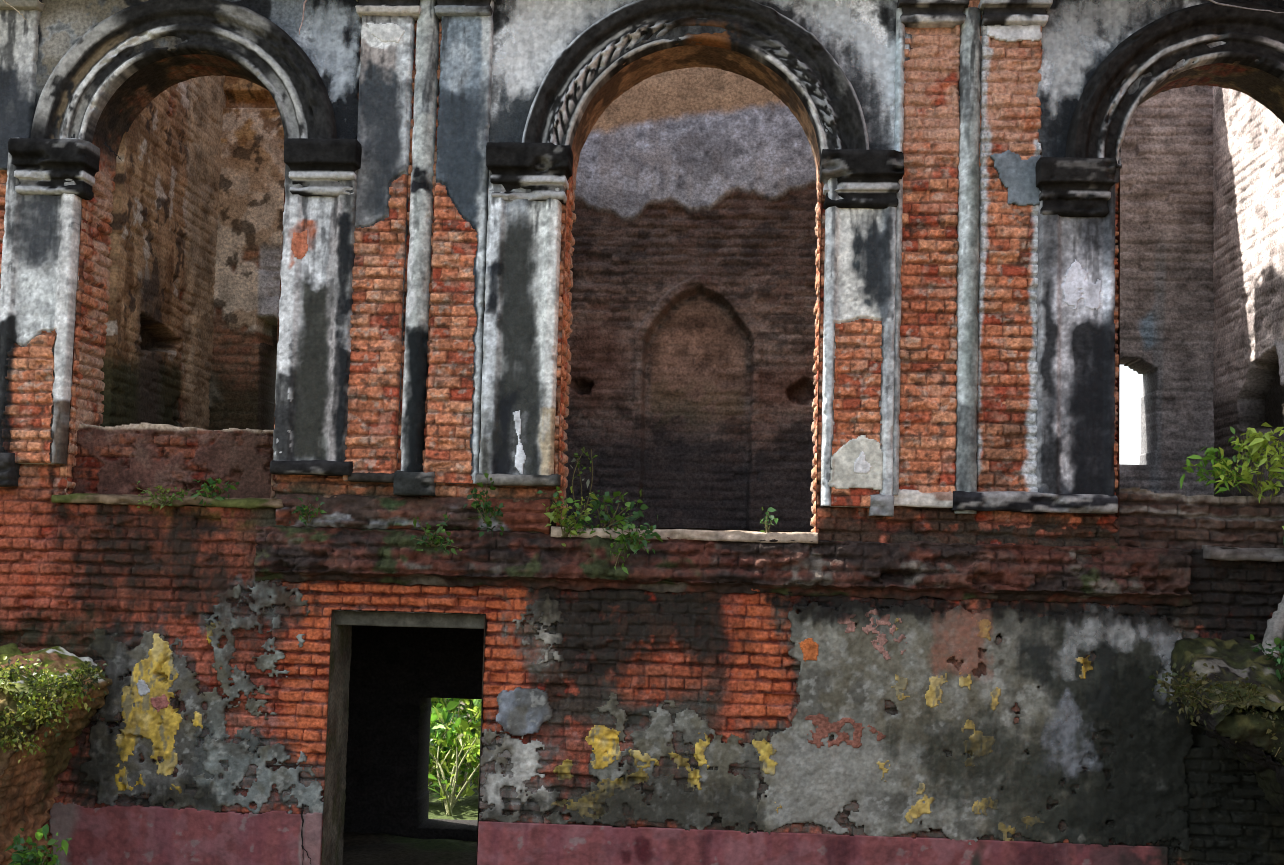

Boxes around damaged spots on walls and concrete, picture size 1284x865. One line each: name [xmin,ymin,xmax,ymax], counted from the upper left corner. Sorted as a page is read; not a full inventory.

leakage [0,79,29,160]
peeling [986,24,1042,42]
peeling [990,150,1041,206]
leakage [294,216,349,462]
spalling [424,181,478,484]
leakage [486,218,539,475]
spalling [828,319,884,507]
leakage [1068,328,1115,495]
peeling [86,576,324,815]
peeling [479,591,1206,846]
leakage [927,638,1282,865]